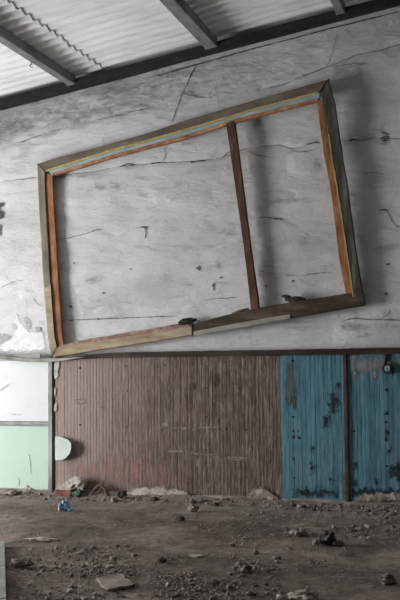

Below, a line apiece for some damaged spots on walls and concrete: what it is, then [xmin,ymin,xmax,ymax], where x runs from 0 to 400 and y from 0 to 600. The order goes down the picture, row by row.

crack [139,11,400,121]
crack [62,142,320,175]
peeling [0,315,46,352]
crack [73,314,172,322]